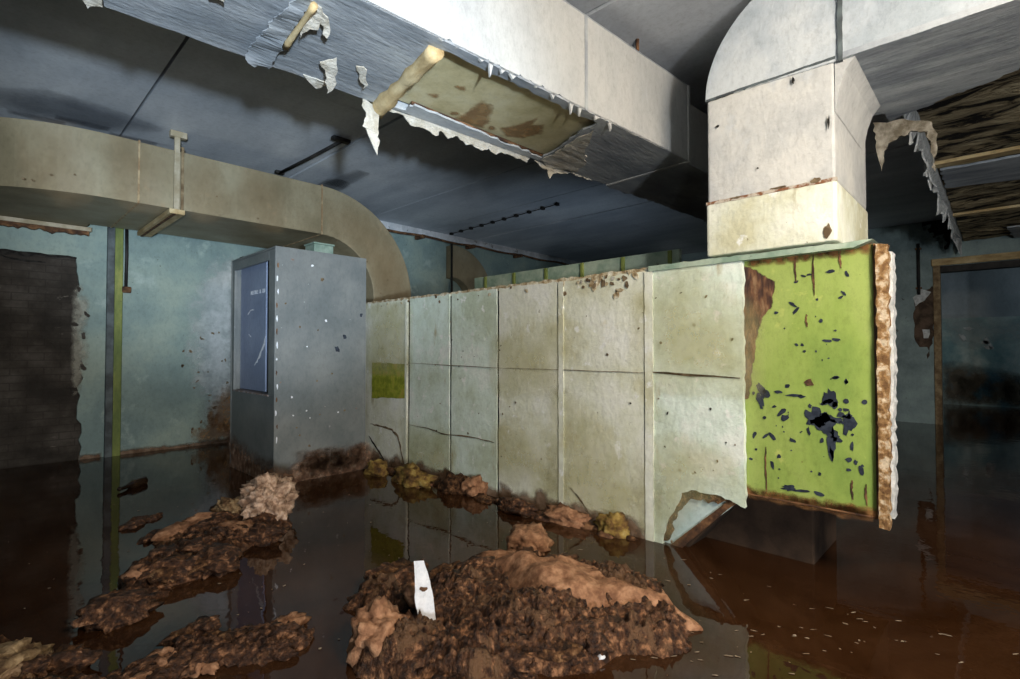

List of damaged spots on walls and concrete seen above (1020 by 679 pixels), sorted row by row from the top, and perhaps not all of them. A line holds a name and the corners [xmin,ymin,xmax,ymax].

peeling [915,219,951,258]
spalling [70,286,90,391]
rust [744,242,871,399]
peeling [749,376,864,497]
rust [747,449,877,519]